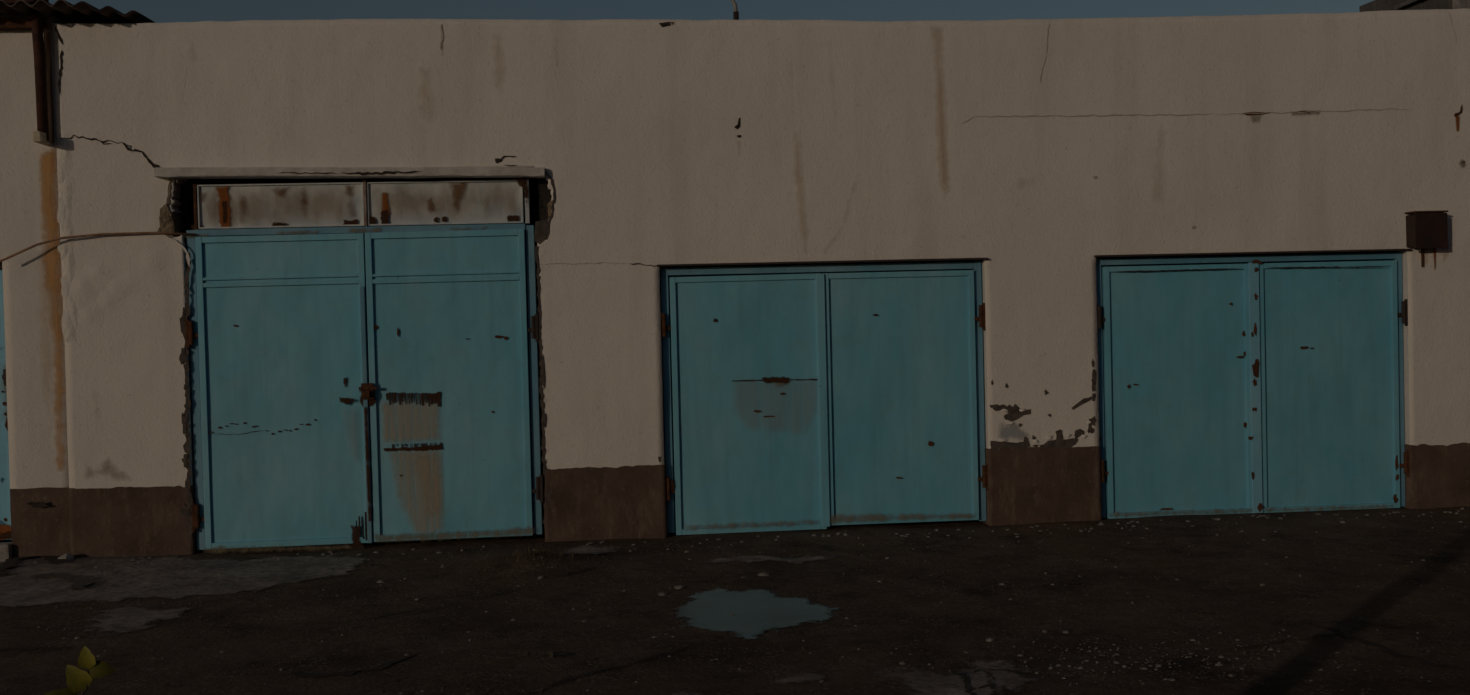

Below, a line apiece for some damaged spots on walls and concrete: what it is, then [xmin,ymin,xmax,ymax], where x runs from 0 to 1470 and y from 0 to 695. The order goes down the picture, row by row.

crack [58,135,160,168]
corrosion [186,186,244,237]
corrosion [342,193,389,233]
corrosion [428,180,466,223]
corrosion [507,177,528,221]
corrosion [732,377,818,385]
peeling [990,358,1096,451]
corrosion [210,377,533,553]